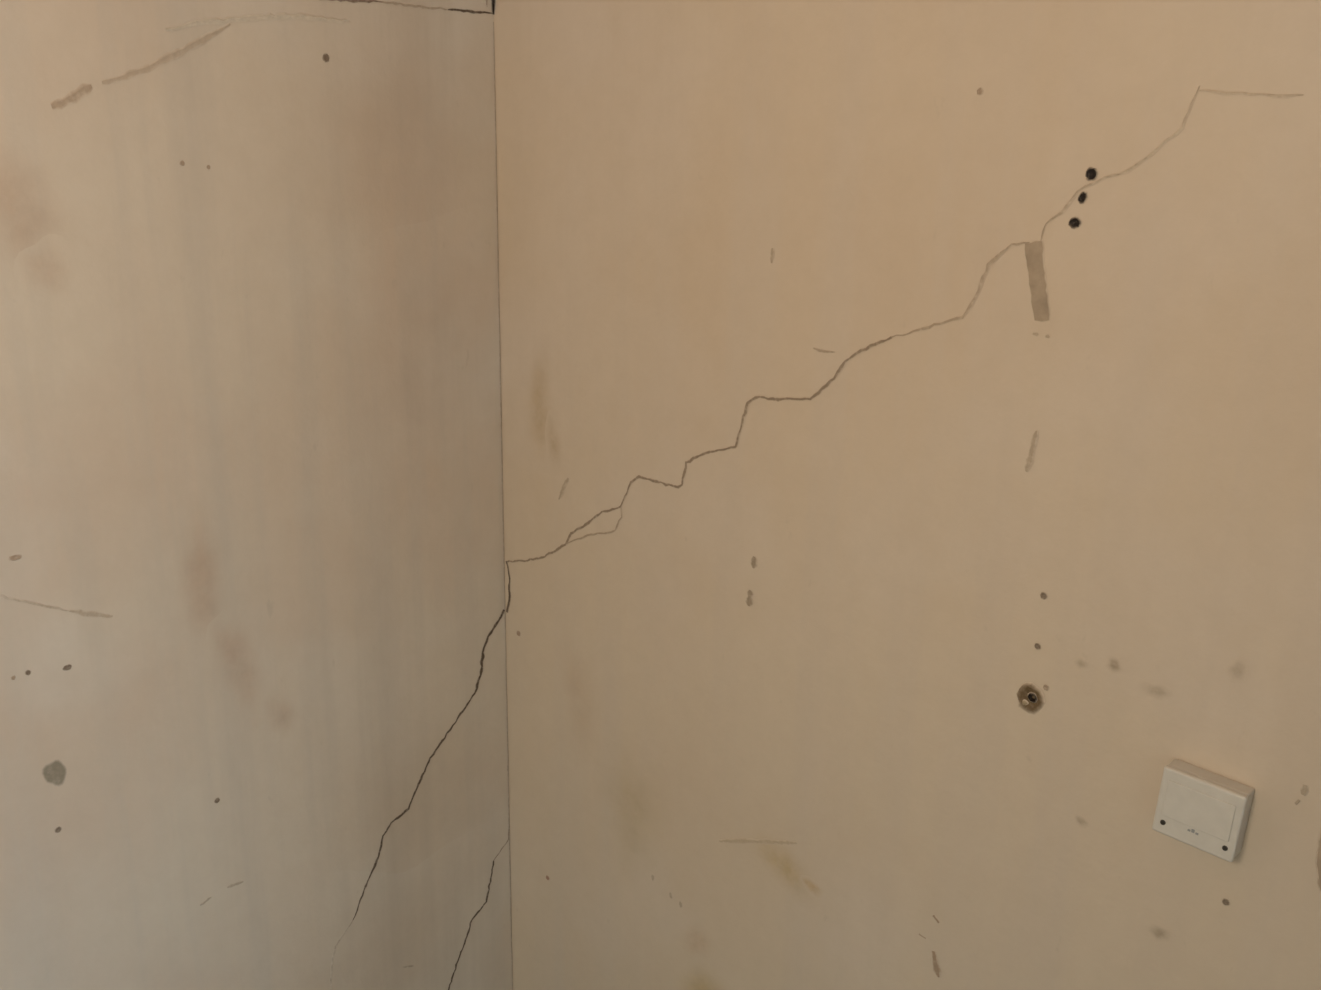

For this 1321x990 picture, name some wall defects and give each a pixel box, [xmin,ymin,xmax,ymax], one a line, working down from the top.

crack [320,0,1303,990]